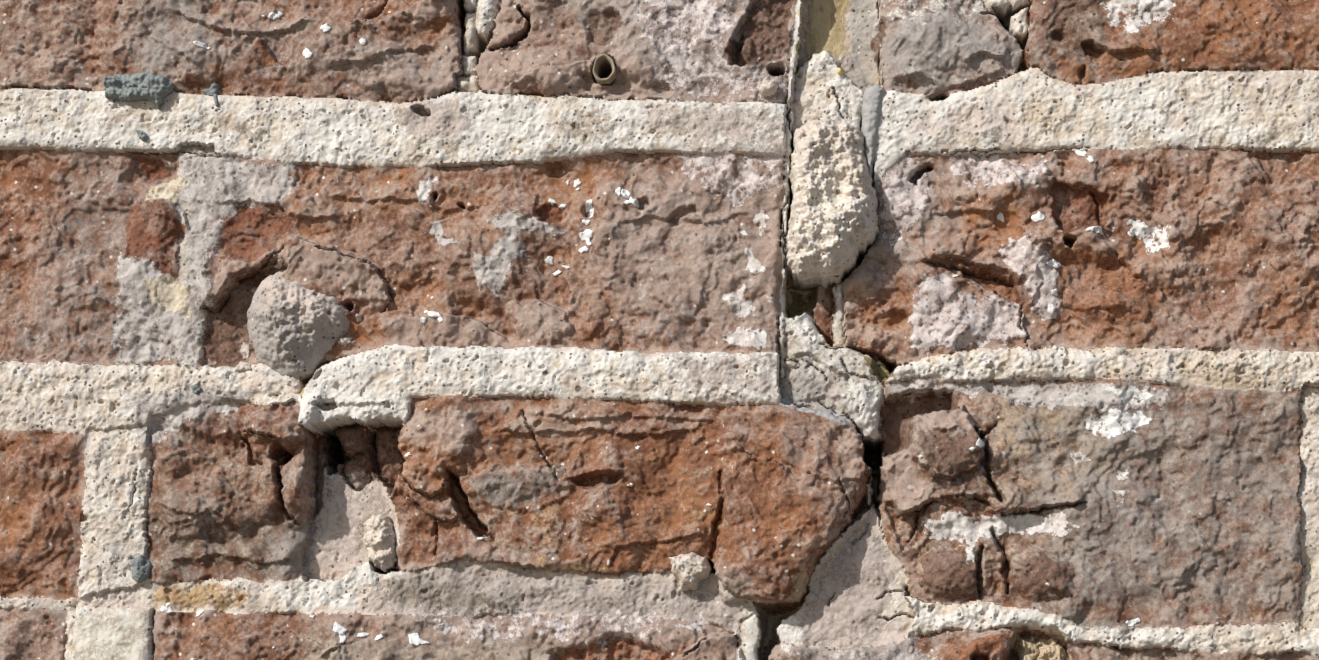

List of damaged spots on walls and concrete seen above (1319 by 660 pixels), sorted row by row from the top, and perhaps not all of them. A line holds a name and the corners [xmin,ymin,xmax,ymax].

spalling [196,204,295,367]
spalling [328,426,403,487]
crack [524,417,557,479]
crack [838,406,1081,594]